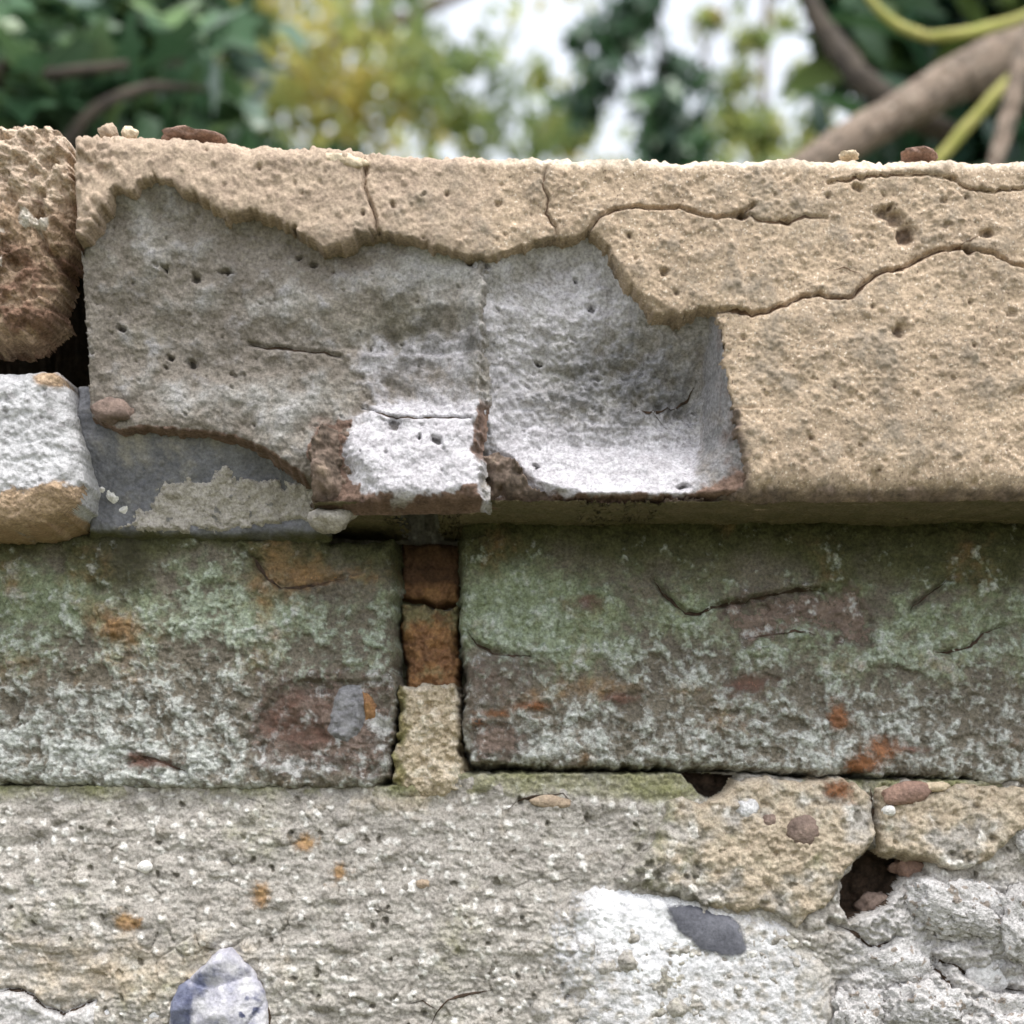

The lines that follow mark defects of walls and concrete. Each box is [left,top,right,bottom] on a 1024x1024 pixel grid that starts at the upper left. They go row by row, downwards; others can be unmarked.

crack [828,174,1023,192]
crack [591,207,689,230]
crack [719,211,822,225]
crack [715,236,1015,318]
spalling [0,125,746,516]
crack [252,345,339,357]
peeling [0,480,87,536]
crack [654,580,820,639]
crack [910,581,946,610]
crack [938,626,1002,654]
crack [5,988,95,1015]